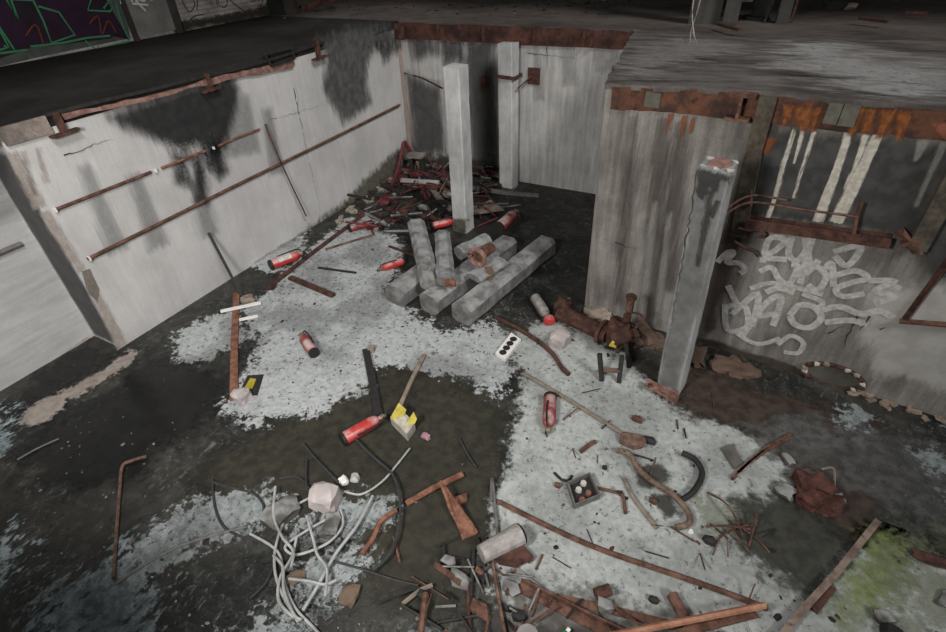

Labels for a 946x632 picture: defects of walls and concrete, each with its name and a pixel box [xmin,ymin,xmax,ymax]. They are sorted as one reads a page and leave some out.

leakage [114,80,281,234]
leakage [255,24,499,263]
rust [781,104,821,132]
leakage [750,128,946,236]
rust [848,107,913,140]
leakage [0,401,28,465]
leakage [0,513,187,632]